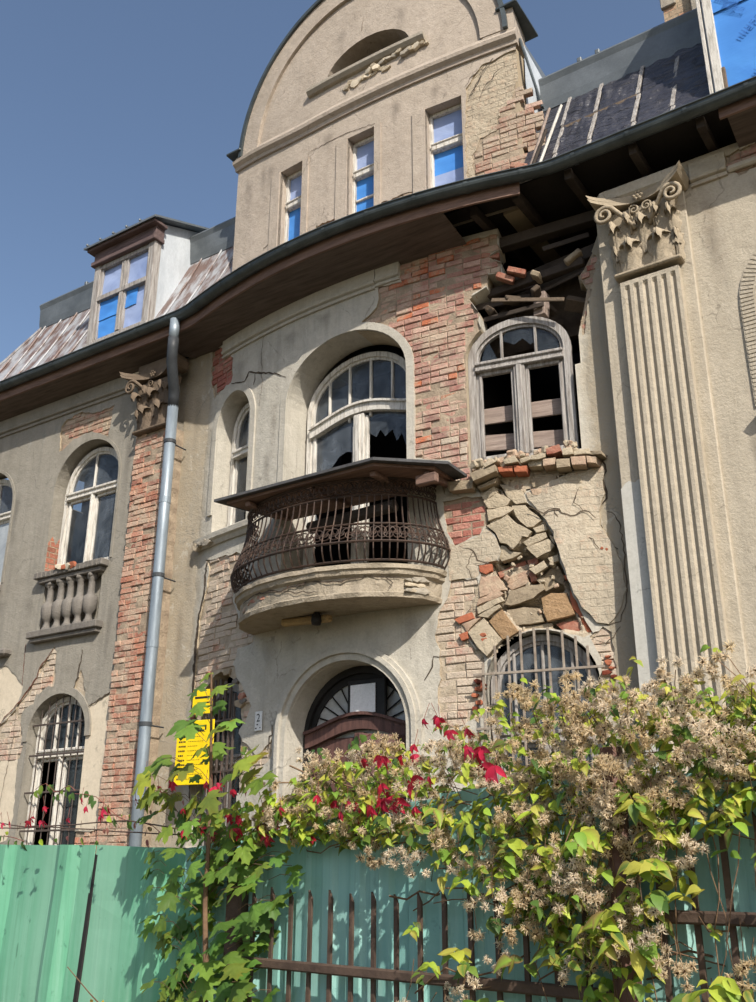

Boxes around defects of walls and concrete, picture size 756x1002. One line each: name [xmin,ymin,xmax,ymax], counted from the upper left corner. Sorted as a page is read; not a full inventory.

flaking render [464,49,546,178]
flaking render [59,405,114,451]
flaking render [211,347,233,399]
crack [231,338,285,406]
flaking render [358,234,617,737]
crack [529,461,628,644]
crack [191,562,208,714]
flaking render [192,539,268,725]
flaking render [0,647,57,842]
flaking render [74,670,110,853]
flaking render [239,738,272,793]